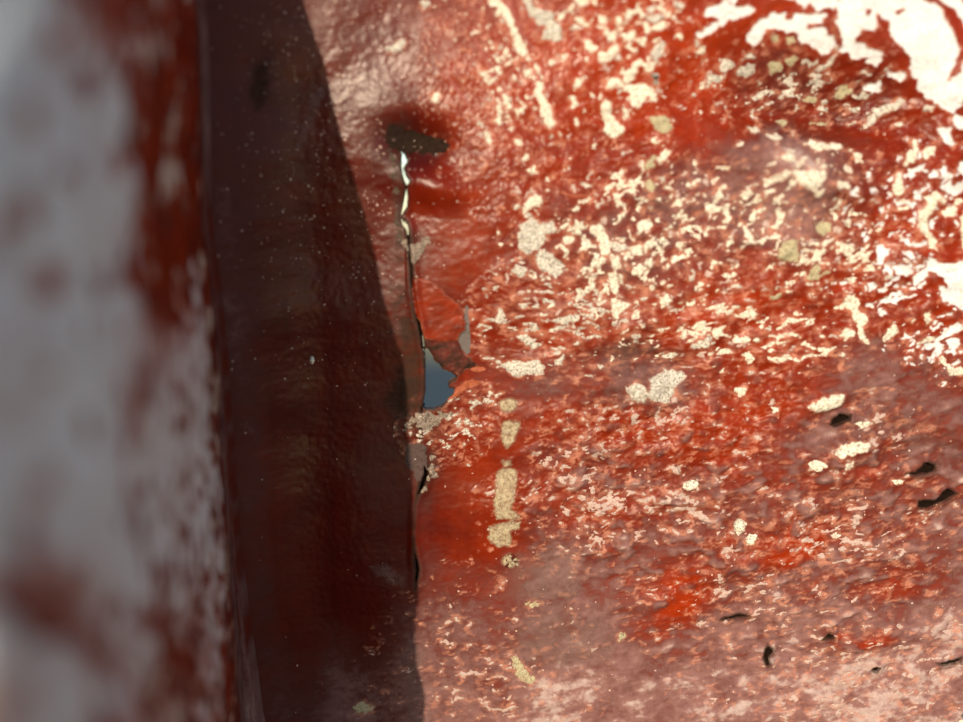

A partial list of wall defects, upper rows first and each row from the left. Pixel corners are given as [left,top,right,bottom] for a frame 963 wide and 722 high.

crack [401,162,413,287]
crack [416,315,426,349]
peeling [384,0,963,574]
crack [418,466,428,494]
peeling [353,701,375,714]
peeling [432,686,465,717]
peeling [438,604,557,718]
peeling [692,570,796,660]
peeling [758,585,963,722]